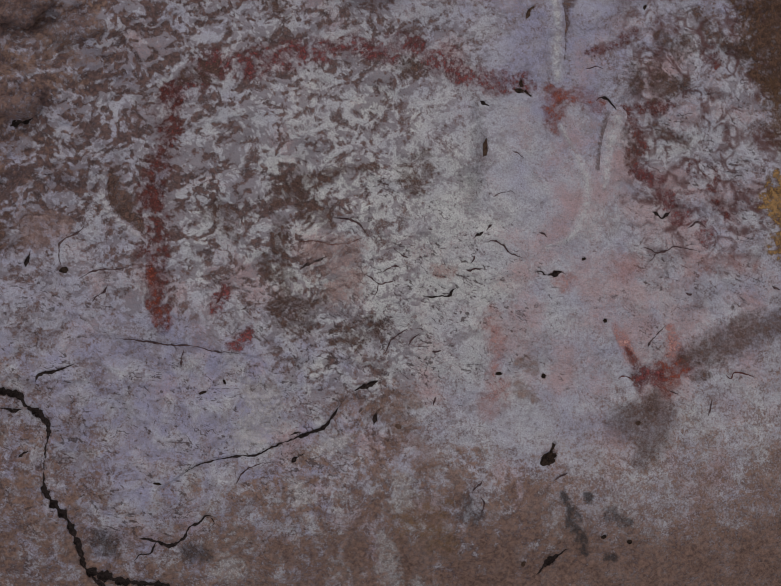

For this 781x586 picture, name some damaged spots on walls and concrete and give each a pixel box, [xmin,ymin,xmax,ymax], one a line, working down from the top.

crack [79,265,131,302]
crack [124,339,245,366]
crack [0,364,214,586]
crack [186,380,378,484]